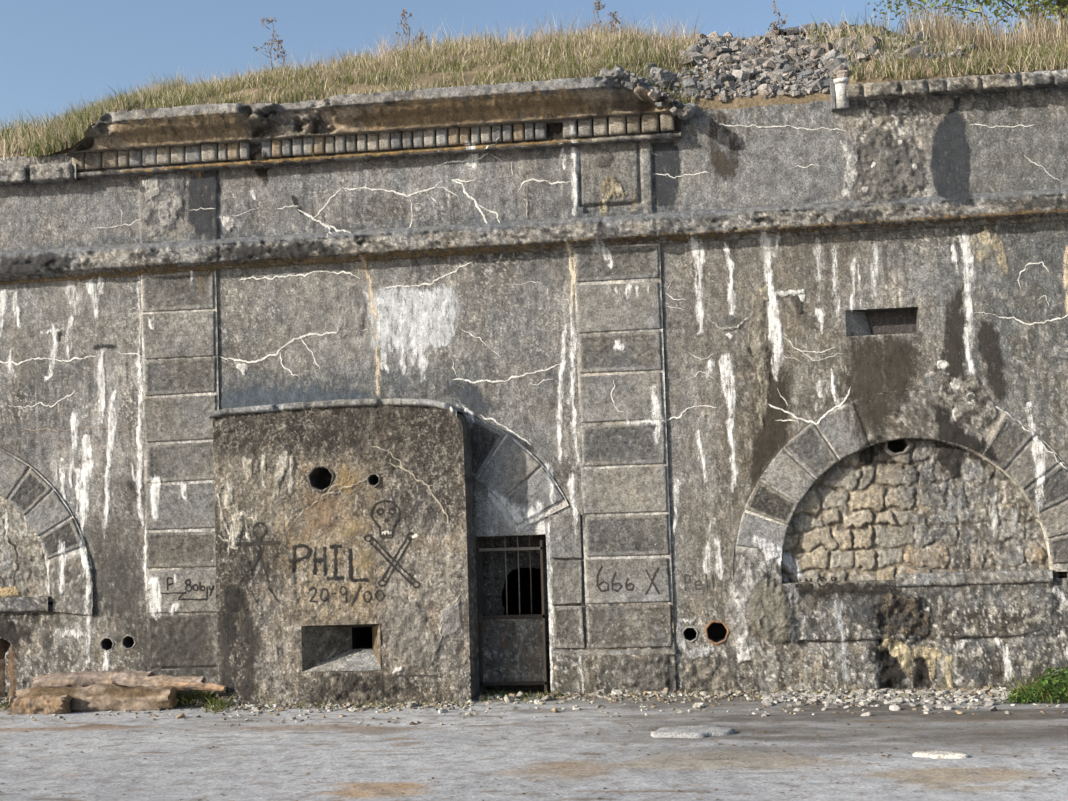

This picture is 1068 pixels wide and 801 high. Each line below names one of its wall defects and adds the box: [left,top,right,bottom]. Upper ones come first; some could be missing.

crack [193,138,571,237]
crack [219,329,368,377]
water stain [210,255,494,422]
water stain [687,237,705,335]
water stain [706,215,793,493]
water stain [814,237,879,334]
water stain [941,233,1008,401]
crack [481,415,531,445]
crack [767,387,851,425]
water stain [40,276,260,700]
crack [286,446,452,531]
crack [0,519,22,588]